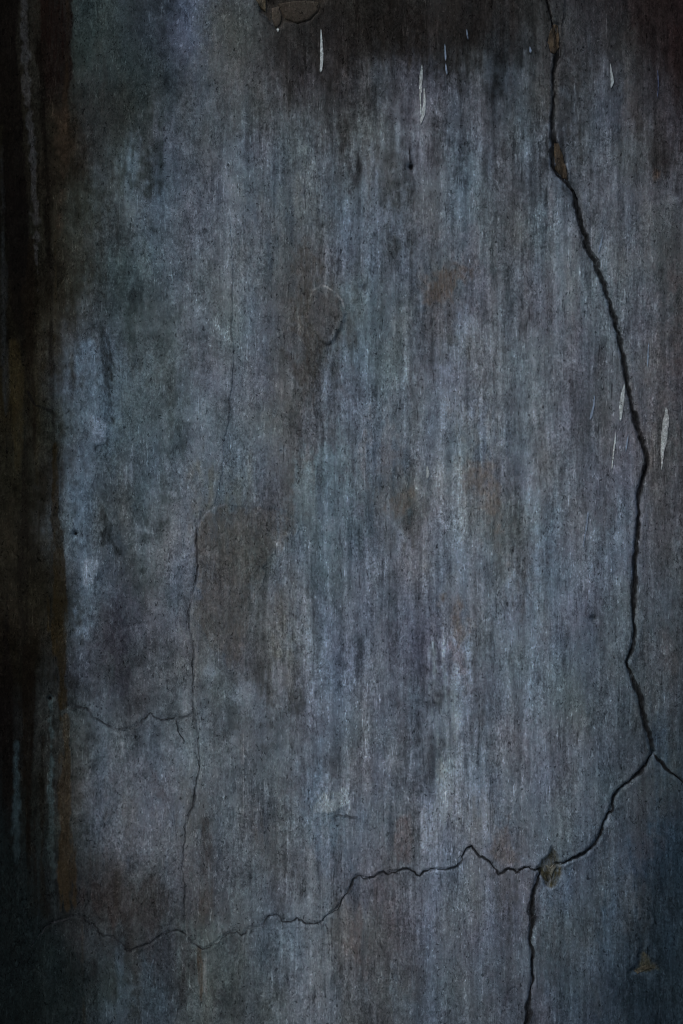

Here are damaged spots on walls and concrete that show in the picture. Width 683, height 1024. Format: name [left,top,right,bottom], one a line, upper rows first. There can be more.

spalling [256,0,327,29]
crack [30,220,543,1024]
spalling [535,846,564,890]
crack [545,0,683,865]